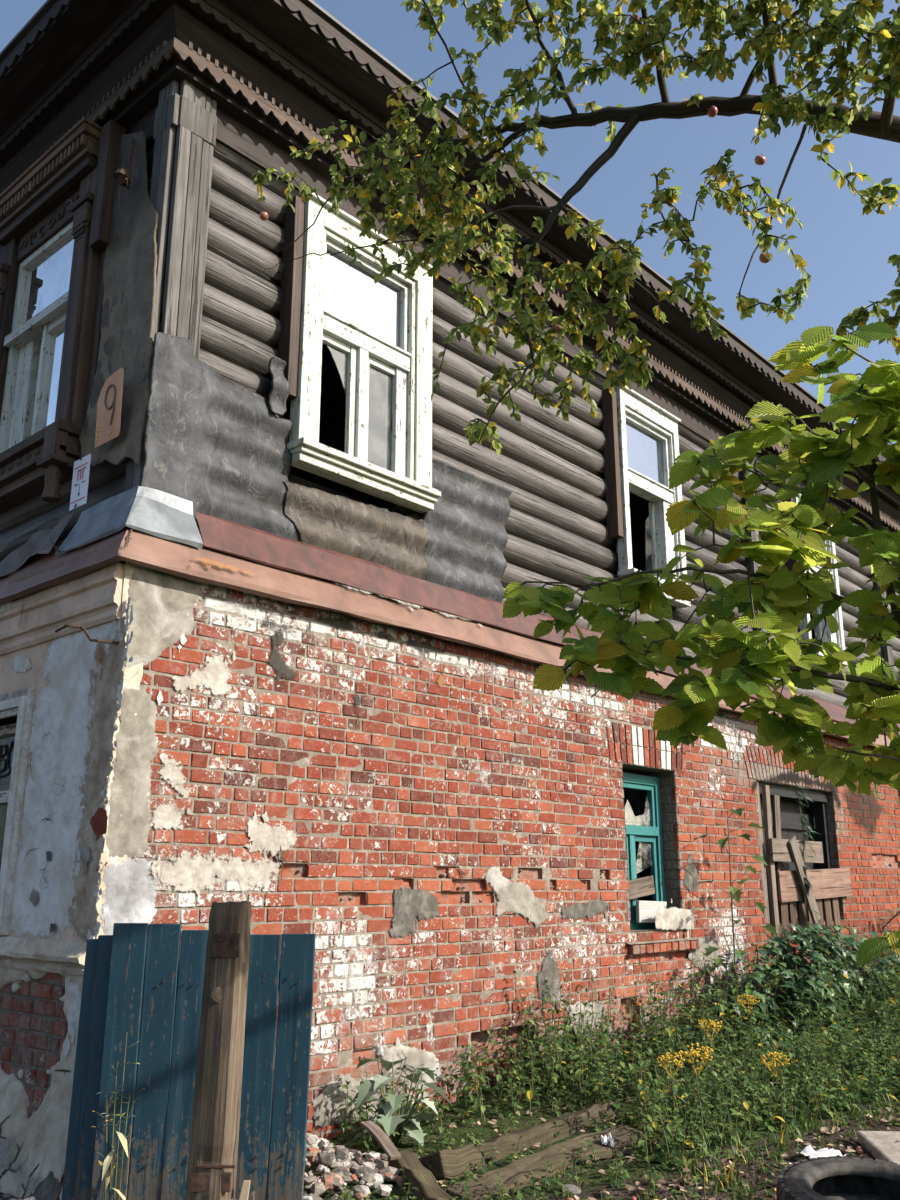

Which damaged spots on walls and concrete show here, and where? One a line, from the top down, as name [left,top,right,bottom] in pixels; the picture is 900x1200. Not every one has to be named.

water stain [214,604,444,656]
peeling [7,567,202,942]
peeling [46,976,81,1074]
water stain [334,943,397,1032]
crack [0,1114,39,1199]